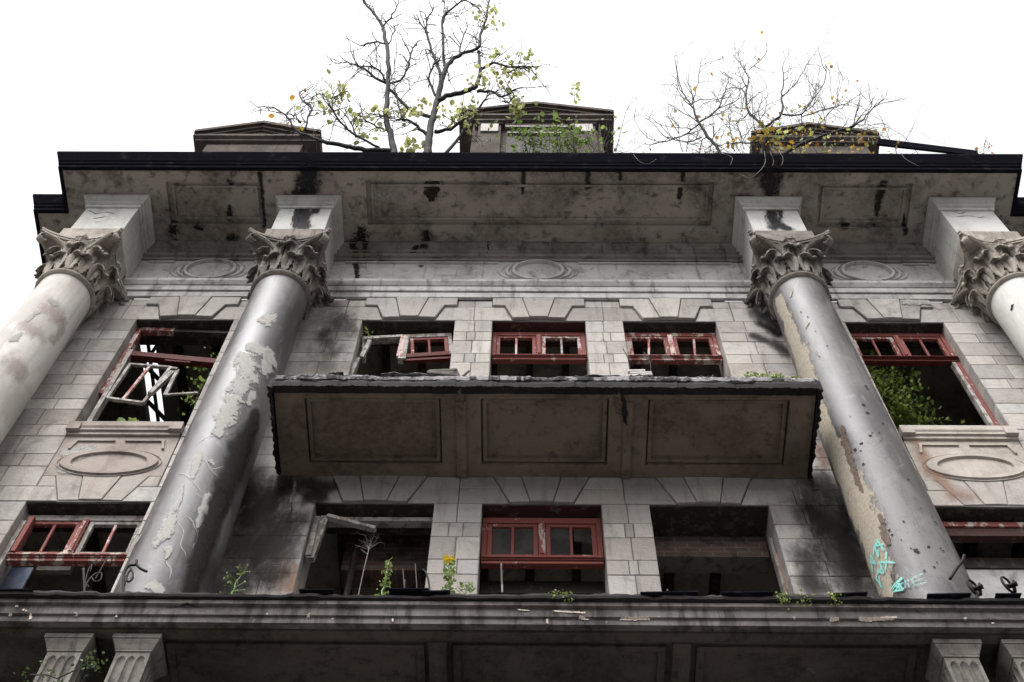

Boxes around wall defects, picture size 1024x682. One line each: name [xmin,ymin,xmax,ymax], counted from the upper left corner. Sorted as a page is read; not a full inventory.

leakage [291,158,322,229]
leakage [754,154,784,196]
leakage [767,210,793,231]
leakage [872,180,887,227]
peeling [136,451,215,559]
crack [165,436,222,579]
peeling [818,395,945,597]
peeling [144,579,165,593]